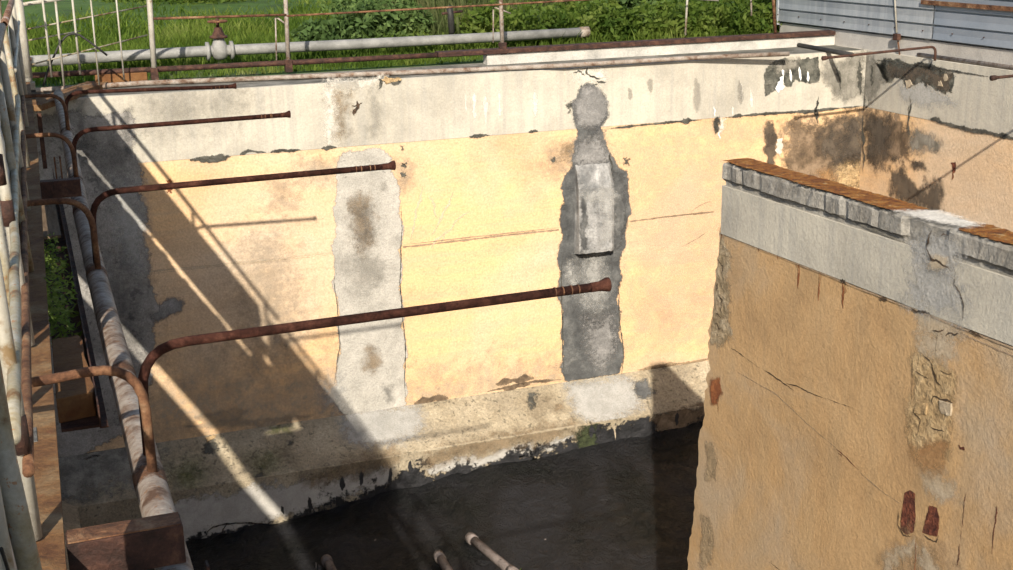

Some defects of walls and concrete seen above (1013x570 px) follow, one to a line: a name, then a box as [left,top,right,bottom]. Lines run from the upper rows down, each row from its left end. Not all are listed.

spalling [764,57,820,96]
water stain [726,55,1013,227]
peeling [877,58,955,94]
peeling [710,236,733,347]
crack [629,201,1013,356]
water stain [174,402,705,541]
corrosion [710,378,723,410]
crack [731,348,899,503]
spalling [905,308,962,472]